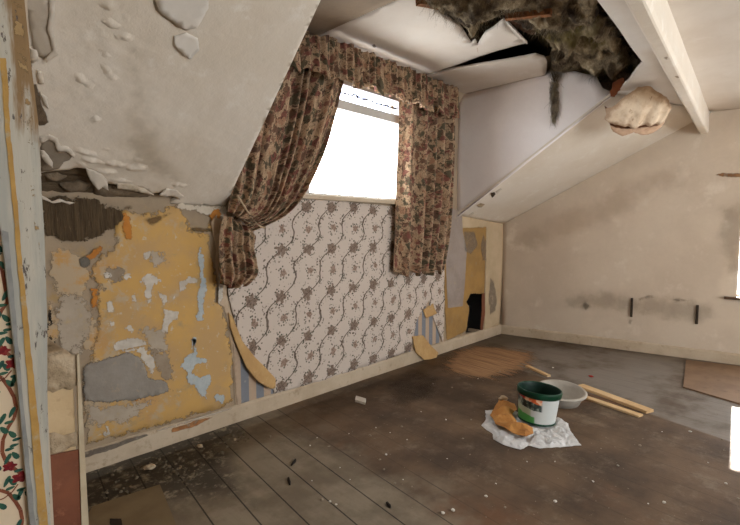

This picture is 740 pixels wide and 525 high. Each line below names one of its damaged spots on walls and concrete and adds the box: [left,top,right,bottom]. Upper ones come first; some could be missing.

peeling [27,0,58,126]
peeling [154,0,209,60]
peeling [39,134,234,455]
peeling [444,203,486,340]